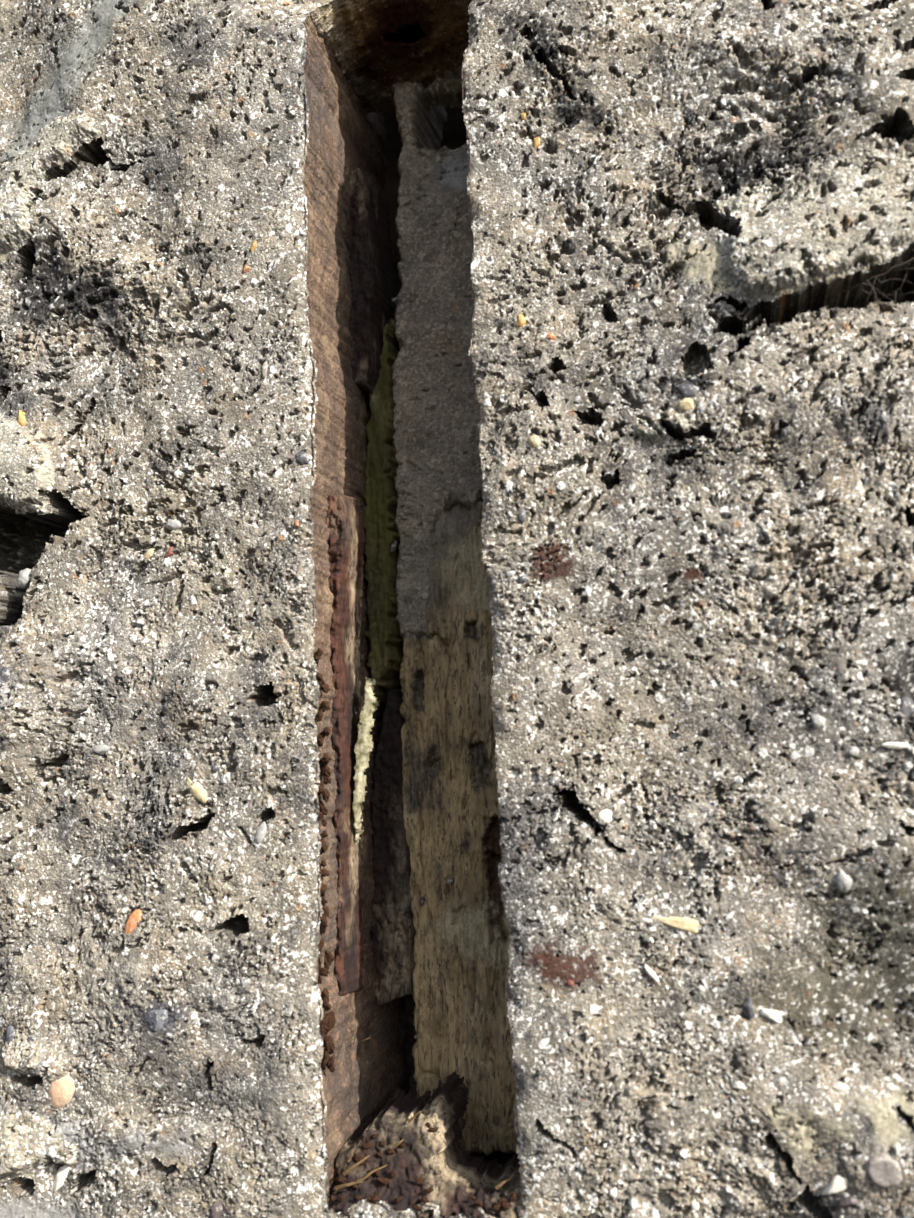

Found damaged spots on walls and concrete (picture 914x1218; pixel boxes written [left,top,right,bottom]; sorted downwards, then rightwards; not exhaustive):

spalling [0,488,87,626]
crack [760,1131,833,1218]